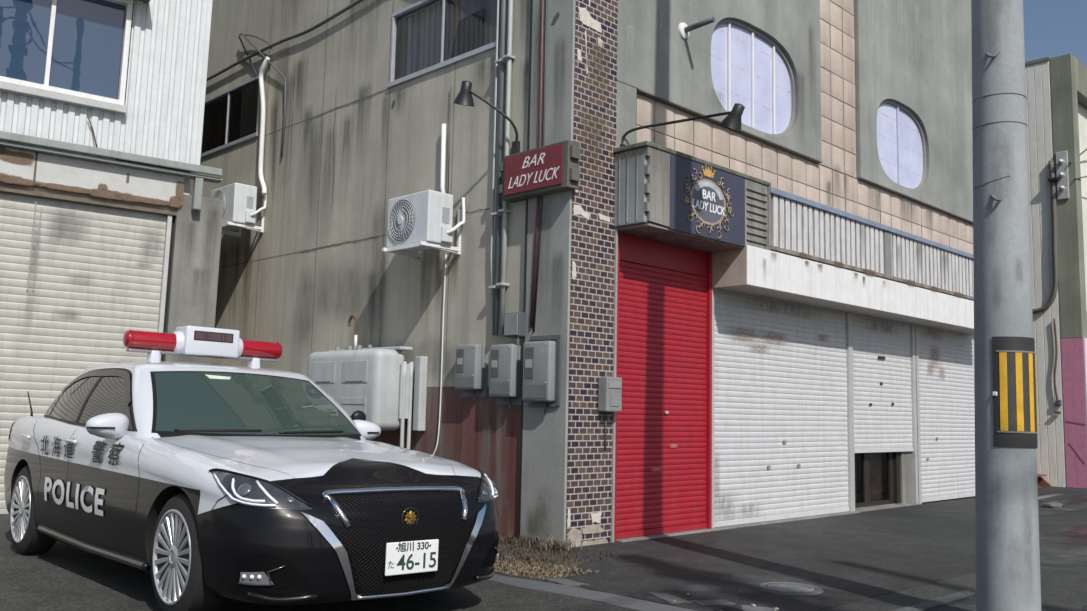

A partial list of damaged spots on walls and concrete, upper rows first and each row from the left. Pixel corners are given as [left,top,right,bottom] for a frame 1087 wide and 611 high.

spalling [578,7,603,48]
peeling [0,146,169,205]